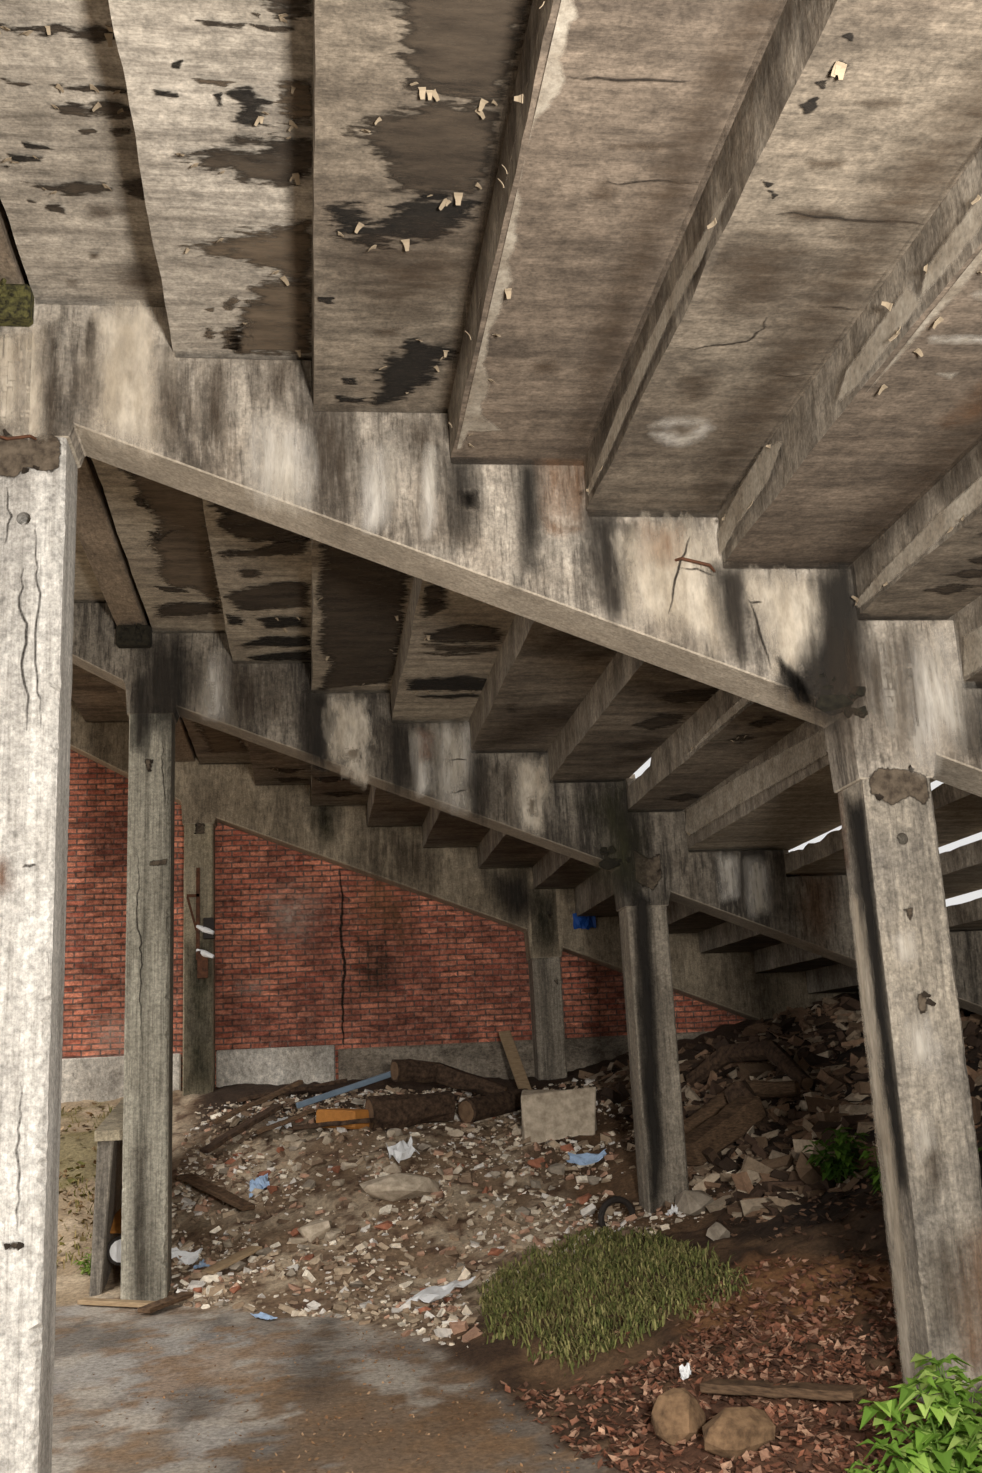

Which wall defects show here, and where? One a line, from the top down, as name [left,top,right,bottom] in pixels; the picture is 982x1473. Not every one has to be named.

peeling [3,142,54,167]
peeling [0,23,115,47]
peeling [28,178,145,214]
peeling [51,83,132,137]
peeling [153,89,179,97]
peeling [172,0,577,449]
crack [7,493,41,719]
peeling [117,468,504,797]
water stain [778,562,897,729]
crack [338,871,346,1047]